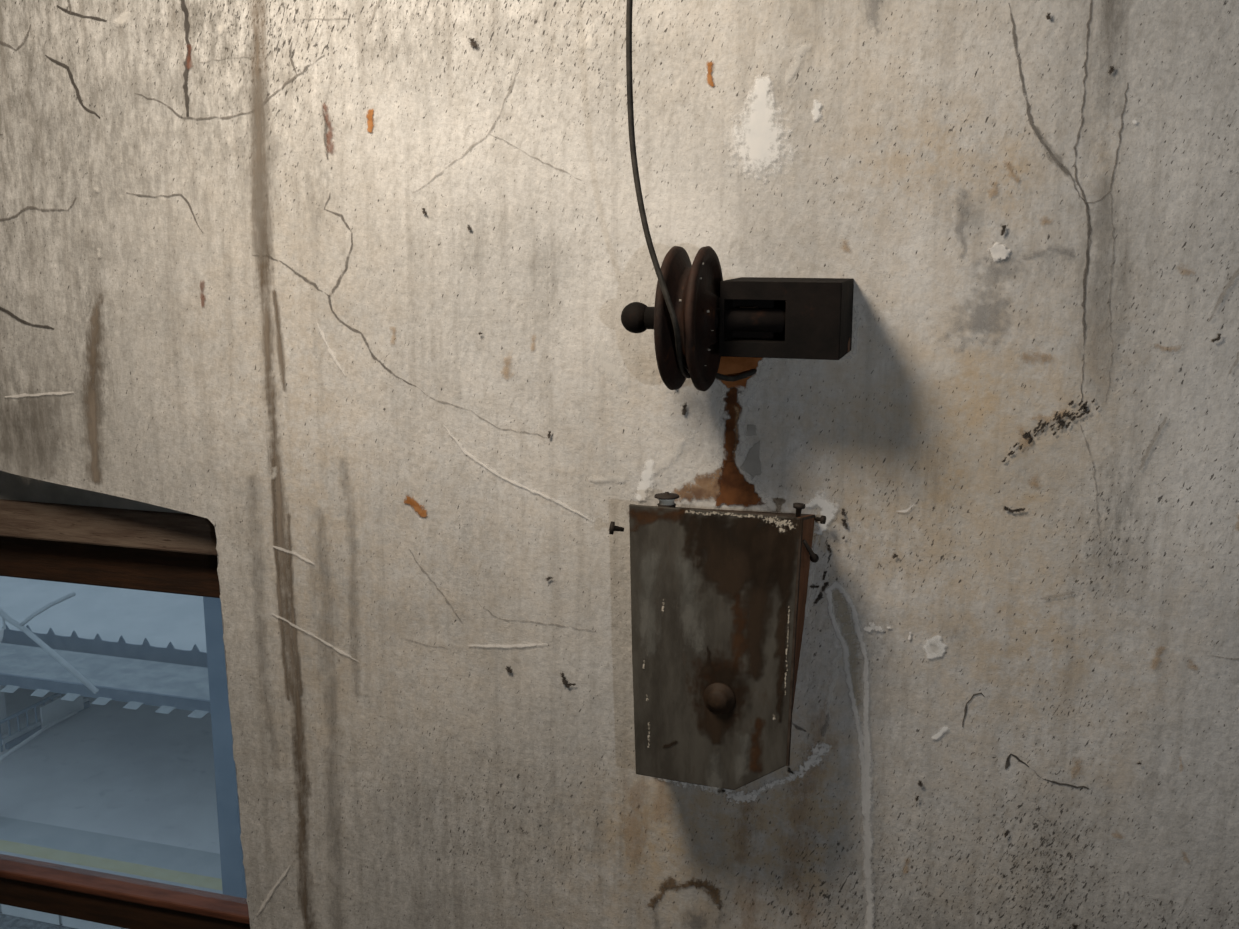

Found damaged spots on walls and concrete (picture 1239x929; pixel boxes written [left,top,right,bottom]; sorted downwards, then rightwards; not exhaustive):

crack [57,0,106,21]
crack [0,24,100,118]
crack [0,197,76,221]
crack [126,192,203,233]
crack [1009,0,1128,401]
crack [0,307,54,329]
crack [253,193,416,387]
corrosion [674,356,764,507]
flaking render [1002,398,1100,462]
water stain [252,0,315,929]
crack [1005,754,1089,789]
water stain [647,878,722,923]